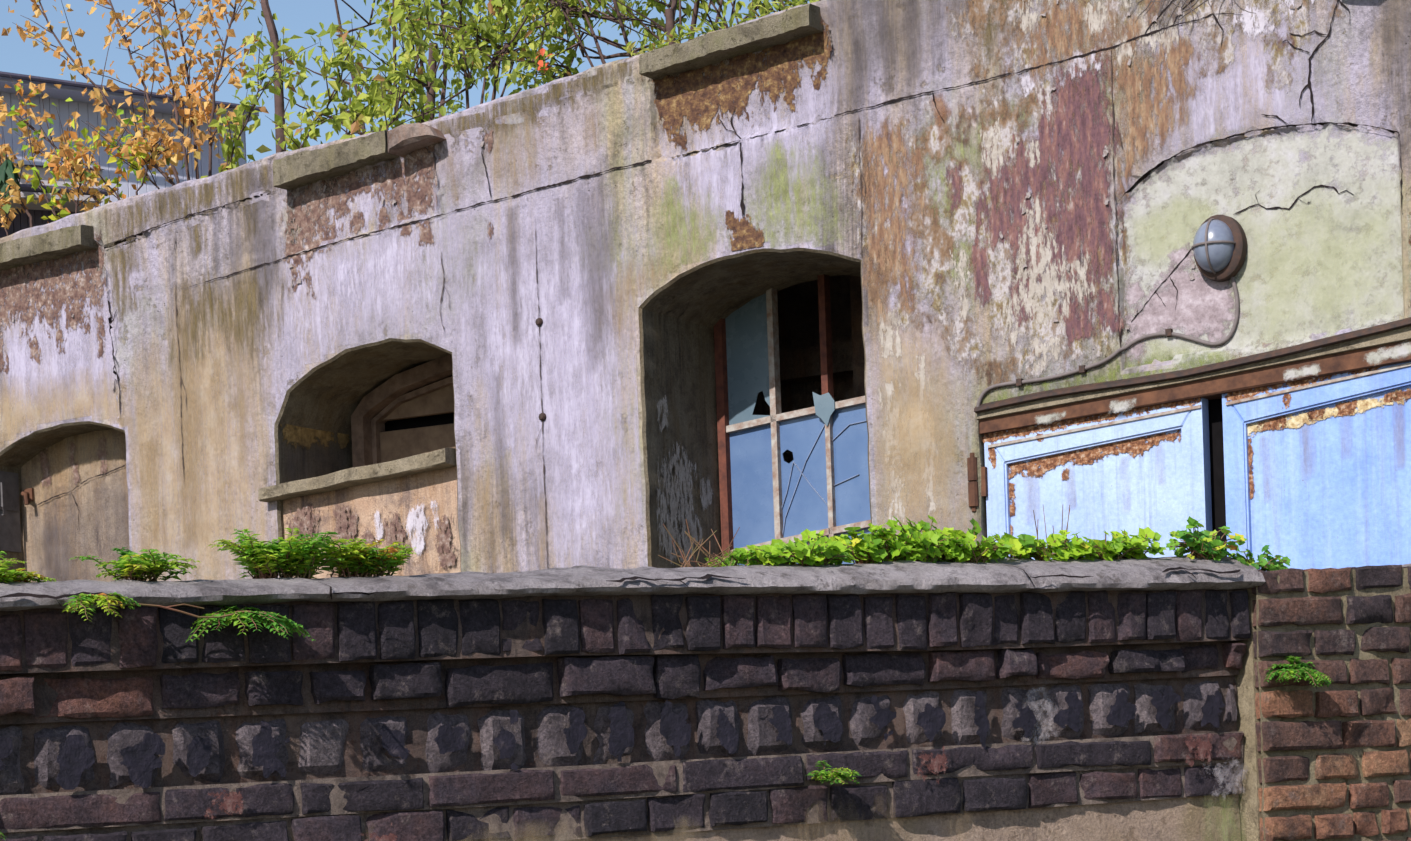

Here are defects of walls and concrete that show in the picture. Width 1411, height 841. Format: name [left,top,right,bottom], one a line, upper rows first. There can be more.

spalling [641,18,837,150]
peeling [0,234,109,374]
crack [104,191,275,413]
peeling [279,145,443,300]
peeling [285,501,457,571]
crack [535,230,548,569]
spalling [725,210,764,251]
crack [175,0,1403,487]
corrosion [981,398,1201,535]
peeling [845,0,1345,390]
corrosion [1224,366,1411,499]
peeling [1367,343,1411,363]